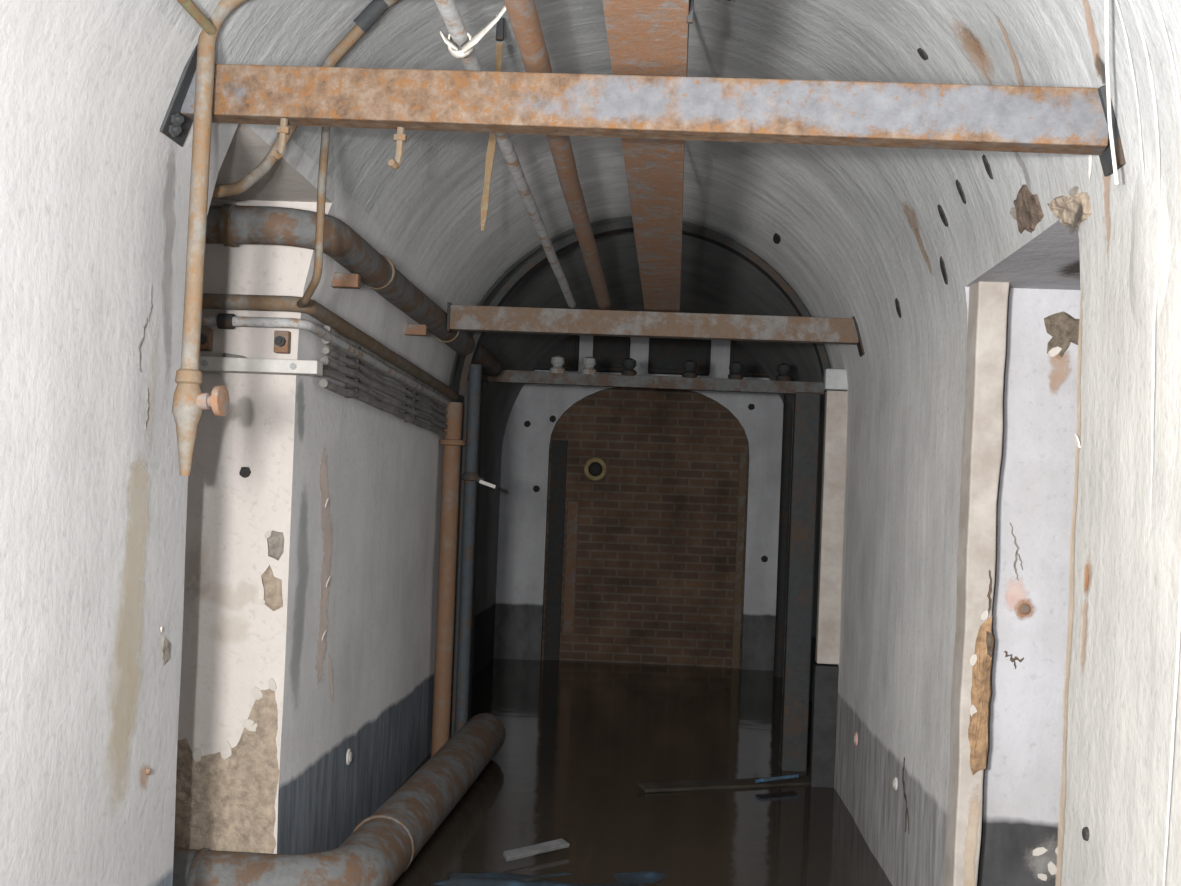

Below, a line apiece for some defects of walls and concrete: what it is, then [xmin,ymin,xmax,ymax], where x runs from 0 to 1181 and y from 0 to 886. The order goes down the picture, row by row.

corrosion [962,30,988,73]
corrosion [906,207,931,271]
spalling [1010,184,1092,234]
spalling [1044,311,1079,390]
spalling [254,530,284,611]
crack [1010,523,1023,581]
corrosion [1007,584,1033,617]
peeling [968,570,994,775]
spalling [174,678,280,854]
peeling [964,798,980,886]